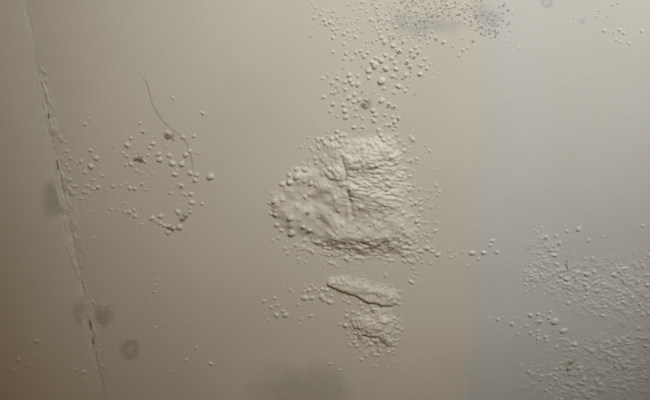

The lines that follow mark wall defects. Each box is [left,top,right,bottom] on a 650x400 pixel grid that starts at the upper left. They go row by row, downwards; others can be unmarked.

crack [20,0,108,400]